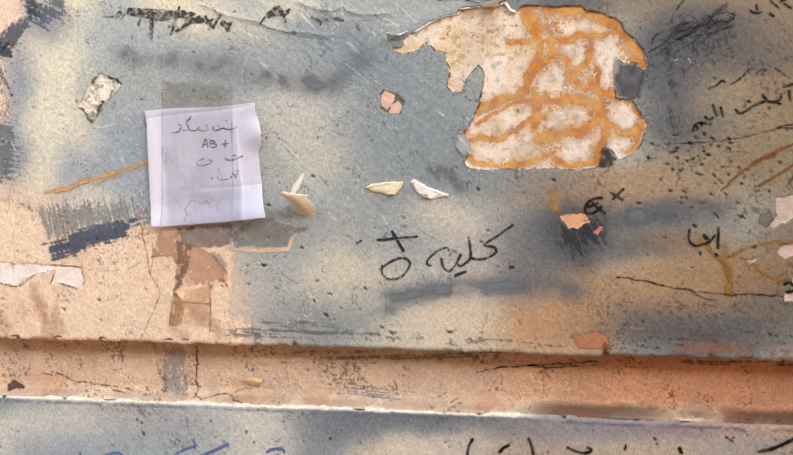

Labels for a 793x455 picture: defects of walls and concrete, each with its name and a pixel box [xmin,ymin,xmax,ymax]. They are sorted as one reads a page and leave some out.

spalling [78,73,121,123]
peeling [380,89,404,114]
peeling [386,0,648,170]
peeling [560,213,603,235]
peeling [758,195,793,228]
peeling [0,262,84,289]
crack [616,276,783,301]
peeling [783,280,793,301]
crack [186,346,244,403]